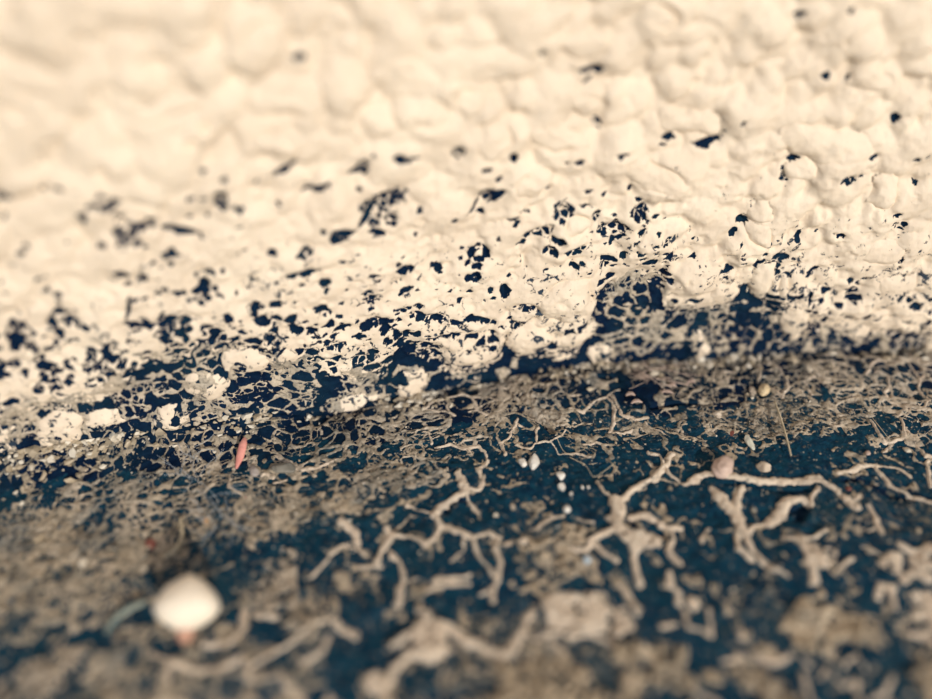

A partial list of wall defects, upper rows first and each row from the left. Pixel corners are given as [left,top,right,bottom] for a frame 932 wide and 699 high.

peeling [658,131,676,146]
peeling [691,129,726,149]
peeling [254,160,297,183]
peeling [347,154,376,175]
peeling [392,155,421,165]
peeling [778,153,801,181]
peeling [186,177,245,218]
peeling [294,181,332,193]
peeling [468,168,513,215]
peeling [0,184,932,699]